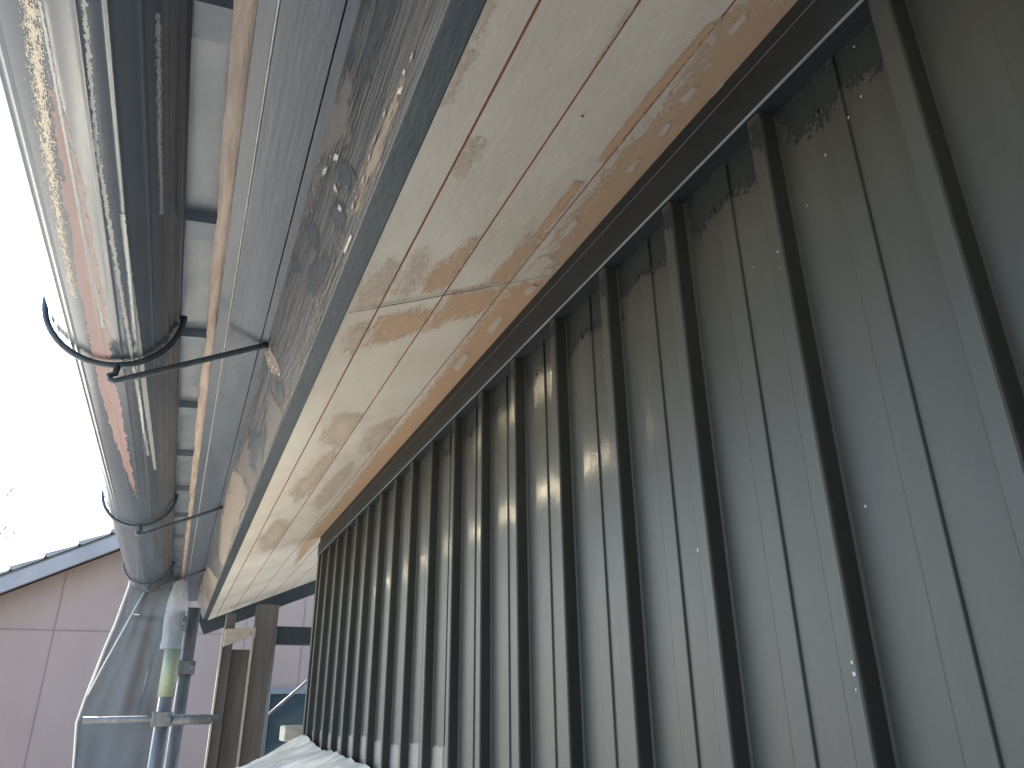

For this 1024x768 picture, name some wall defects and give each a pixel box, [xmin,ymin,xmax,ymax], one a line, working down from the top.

water stain [775,20,885,151]
water stain [686,119,763,242]
corrosion [49,87,137,498]
peeling [283,0,798,564]
water stain [618,208,672,321]
peeling [265,347,281,376]